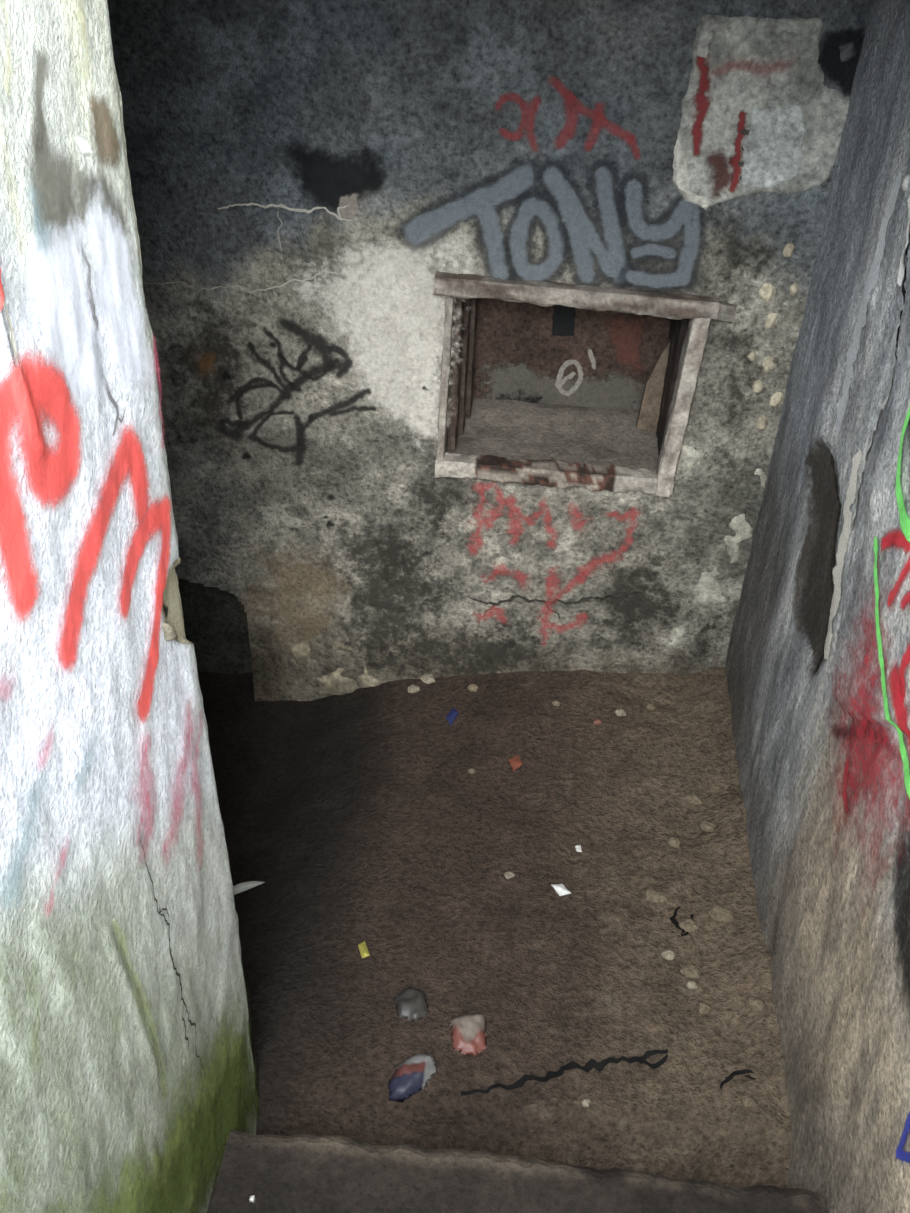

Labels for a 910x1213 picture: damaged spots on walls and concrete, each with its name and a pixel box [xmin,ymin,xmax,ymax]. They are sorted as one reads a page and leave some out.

crack [895,232,910,359]
crack [470,593,643,619]
crack [140,841,206,1075]
crack [461,1049,668,1095]